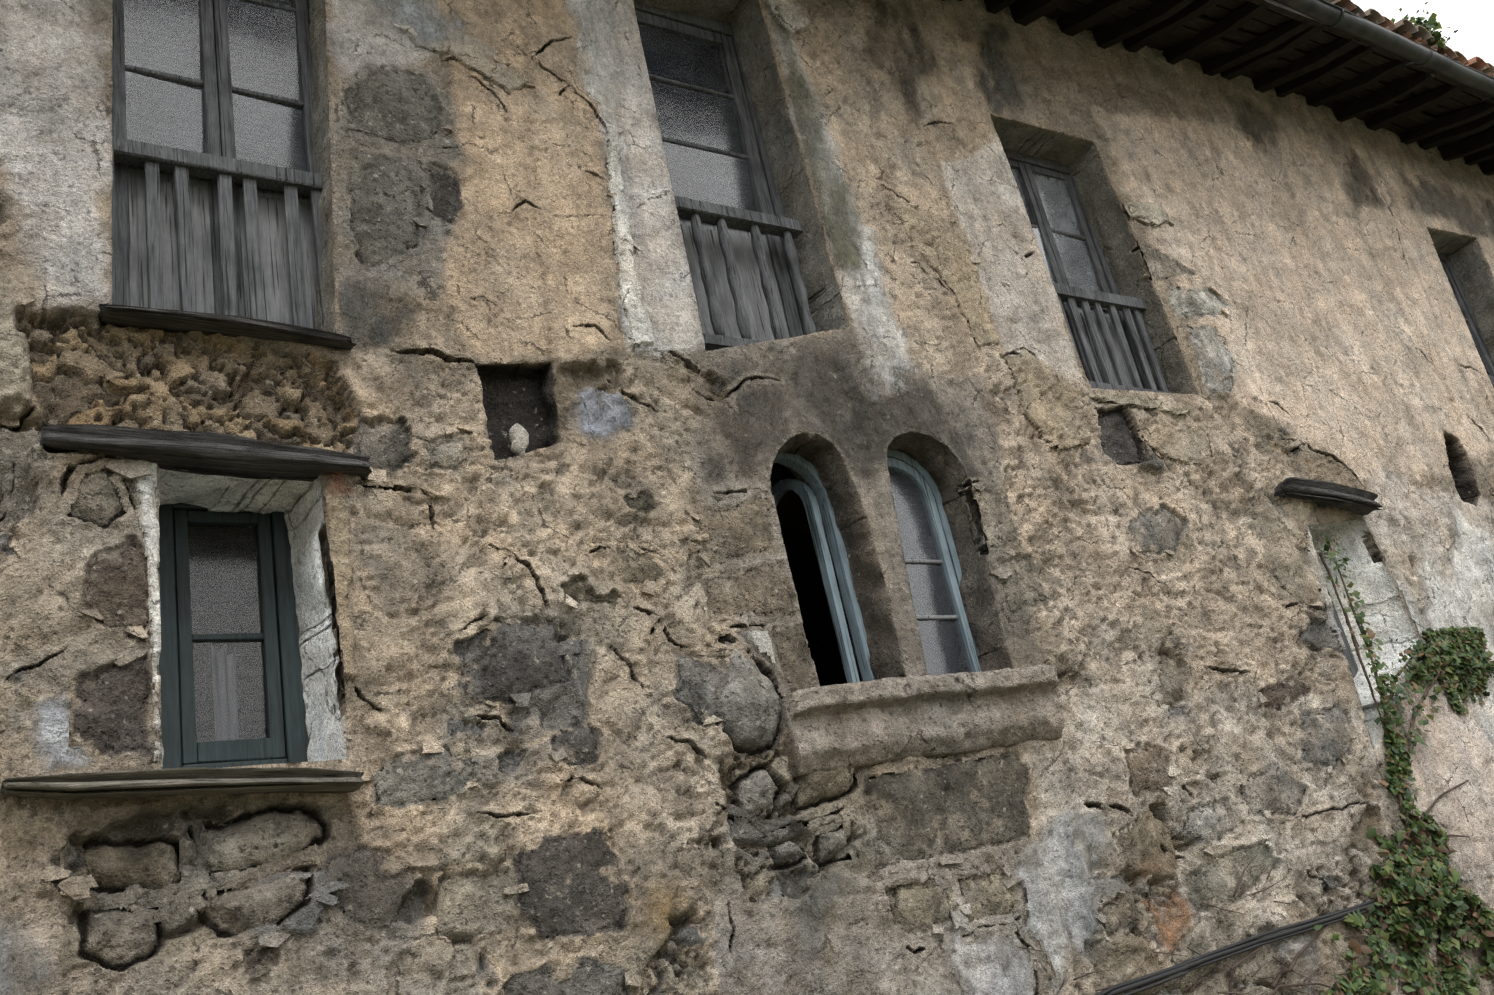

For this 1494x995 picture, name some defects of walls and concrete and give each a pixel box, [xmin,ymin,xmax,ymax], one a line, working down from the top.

crack [435,54,514,119]
crack [333,122,464,155]
crack [505,33,632,279]
crack [462,292,504,318]
peeling [0,292,35,430]
crack [382,342,482,372]
crack [566,318,787,418]
spalling [0,519,32,572]
spalling [50,452,161,771]
spalling [447,483,1038,949]
spalling [33,738,491,987]